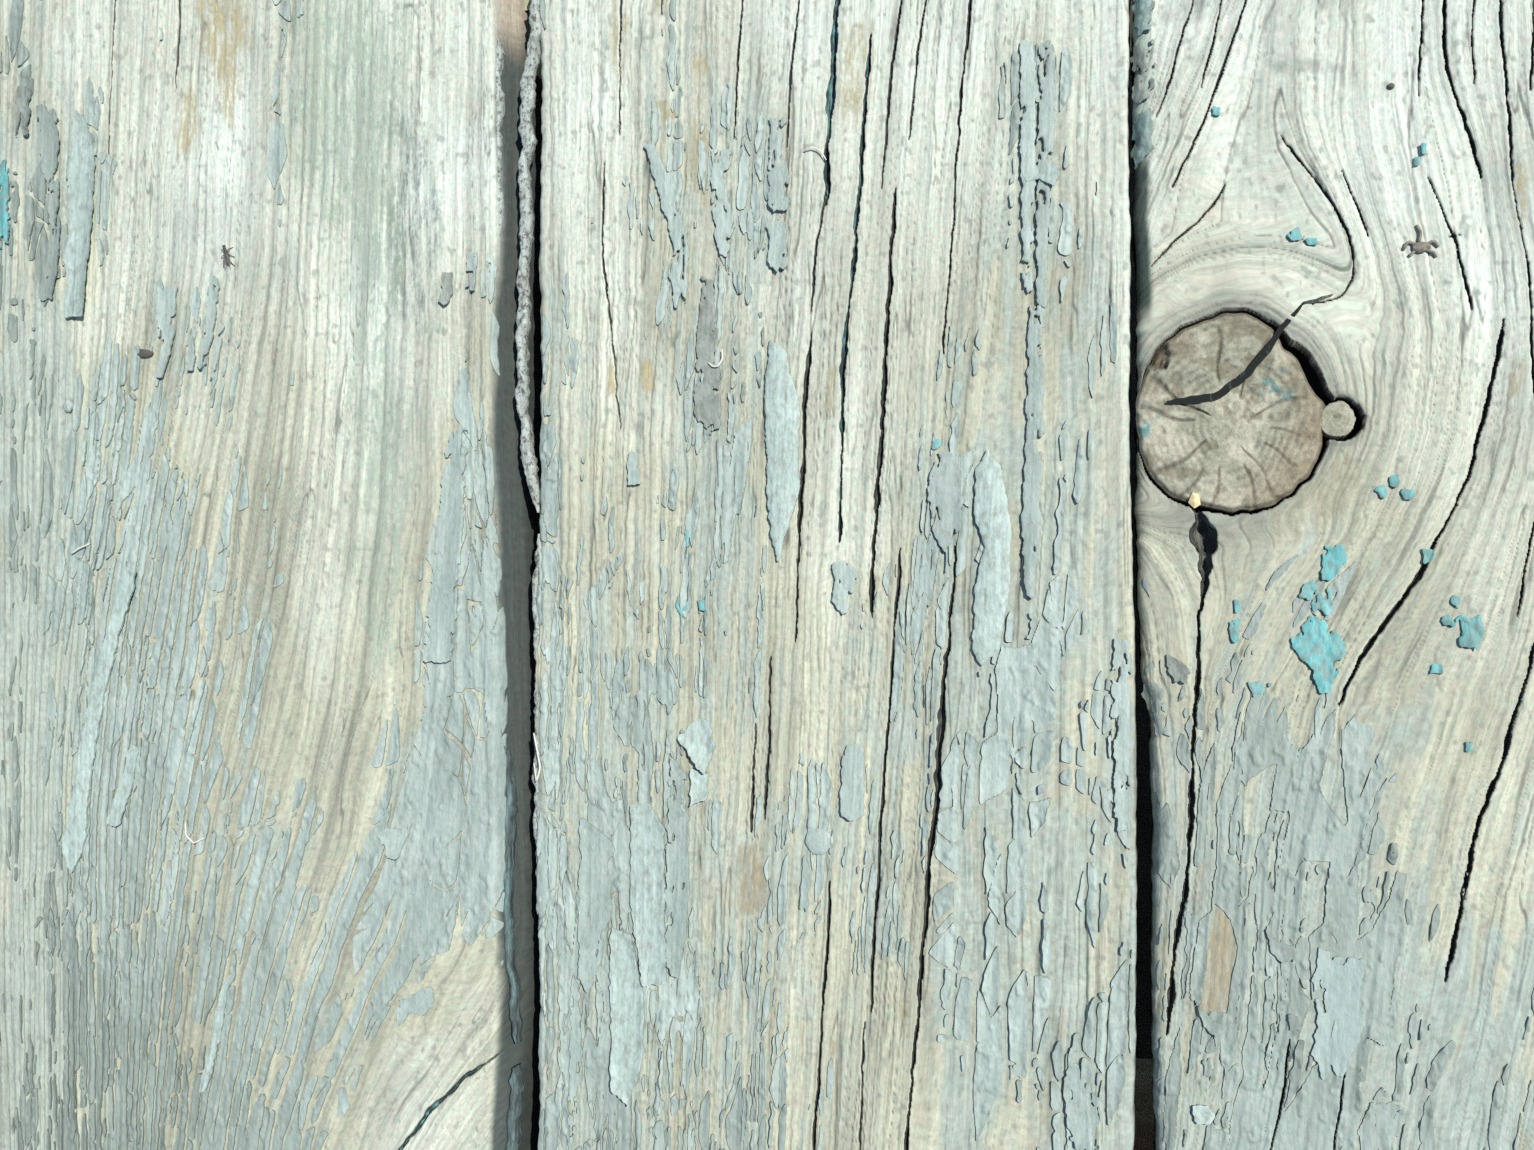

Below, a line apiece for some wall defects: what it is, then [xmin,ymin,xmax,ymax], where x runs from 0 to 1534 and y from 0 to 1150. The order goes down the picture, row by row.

peeling [0,0,508,1150]
crack [750,0,927,1150]
crack [904,546,956,1150]
peeling [536,0,1456,1150]
crack [1157,0,1246,187]
crack [1149,137,1369,1035]
crack [1339,0,1534,705]
peeling [1441,595,1461,627]
crack [1445,525,1534,981]
peeling [1483,1063,1509,1150]
peeling [1514,1080,1532,1150]
peeling [1523,989,1534,1040]